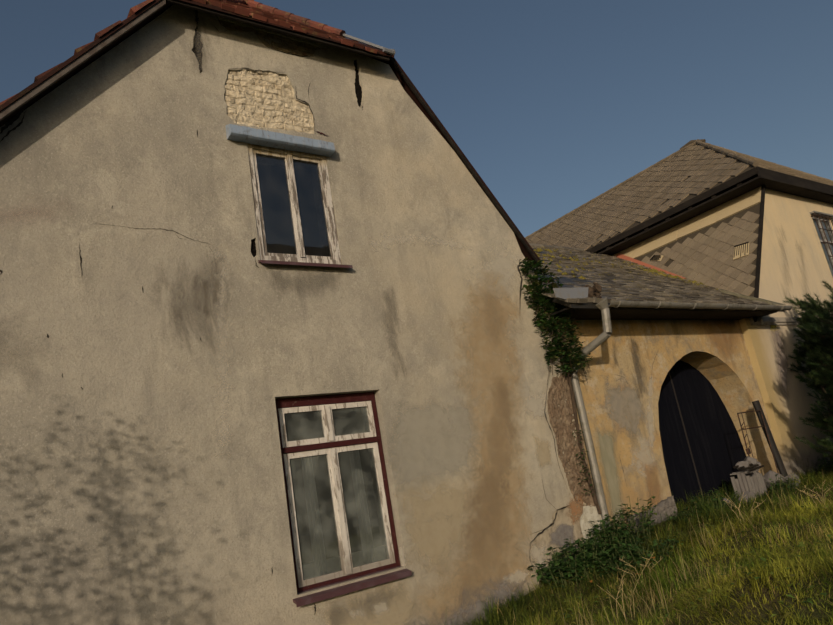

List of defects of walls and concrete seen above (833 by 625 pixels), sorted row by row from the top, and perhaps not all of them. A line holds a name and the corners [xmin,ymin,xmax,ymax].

crack [192,10,203,73]
crack [0,108,26,142]
flaking render [224,68,328,136]
crack [354,60,363,108]
crack [103,224,216,264]
water stain [426,295,529,618]
flaking render [527,373,602,584]